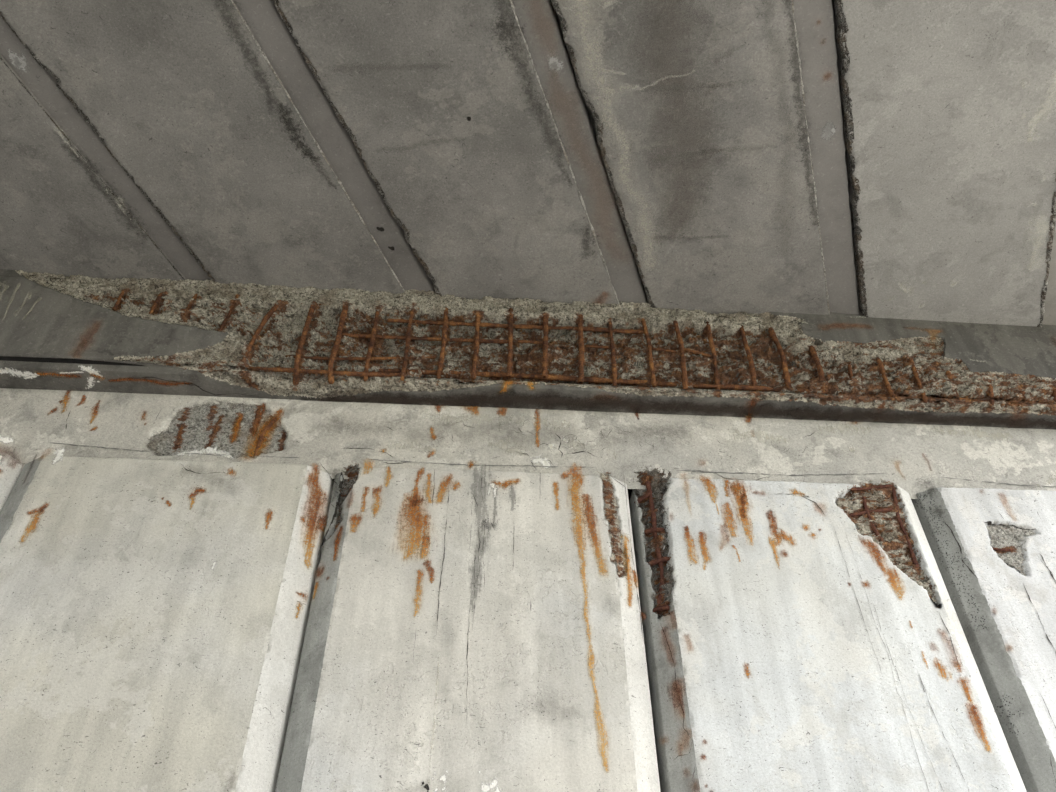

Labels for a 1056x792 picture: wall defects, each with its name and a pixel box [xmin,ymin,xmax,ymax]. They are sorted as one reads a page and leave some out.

spalling [0,0,1056,458]
corrosion [296,464,391,618]
corrosion [400,427,461,616]
peeling [530,438,568,469]
corrosion [553,464,608,772]
spalling [633,465,676,619]
corrosion [684,526,710,570]
corrosion [701,476,763,562]
corrosion [766,510,794,568]
spalling [835,478,985,629]
spalling [986,520,1041,576]
corrosion [922,644,991,751]